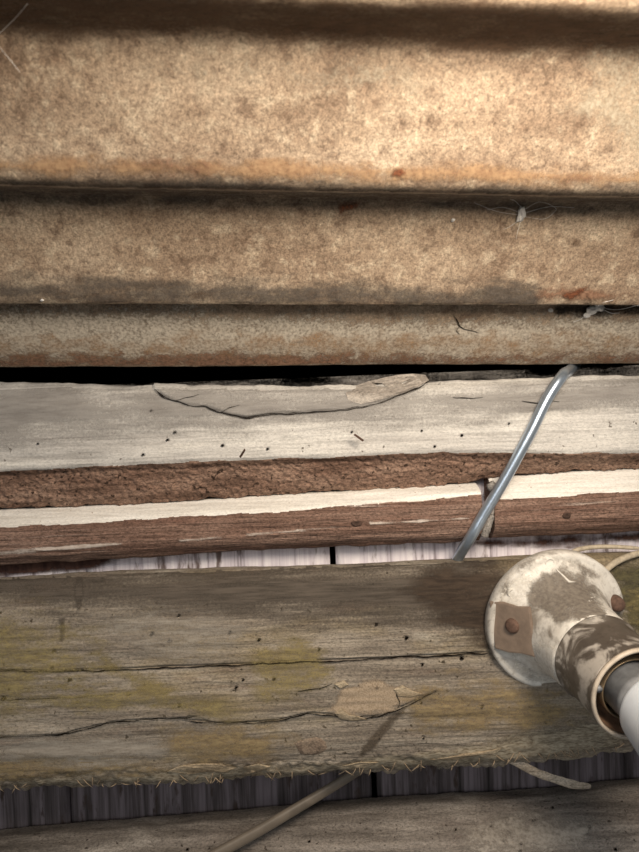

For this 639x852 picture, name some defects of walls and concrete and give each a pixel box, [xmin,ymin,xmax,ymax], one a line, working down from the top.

water stain [0,0,639,148]
rust [100,158,639,184]
crack [156,381,428,419]
water stain [0,559,518,659]
crack [6,653,486,672]
crack [365,691,436,719]
crack [0,713,338,738]
water stain [2,734,167,770]